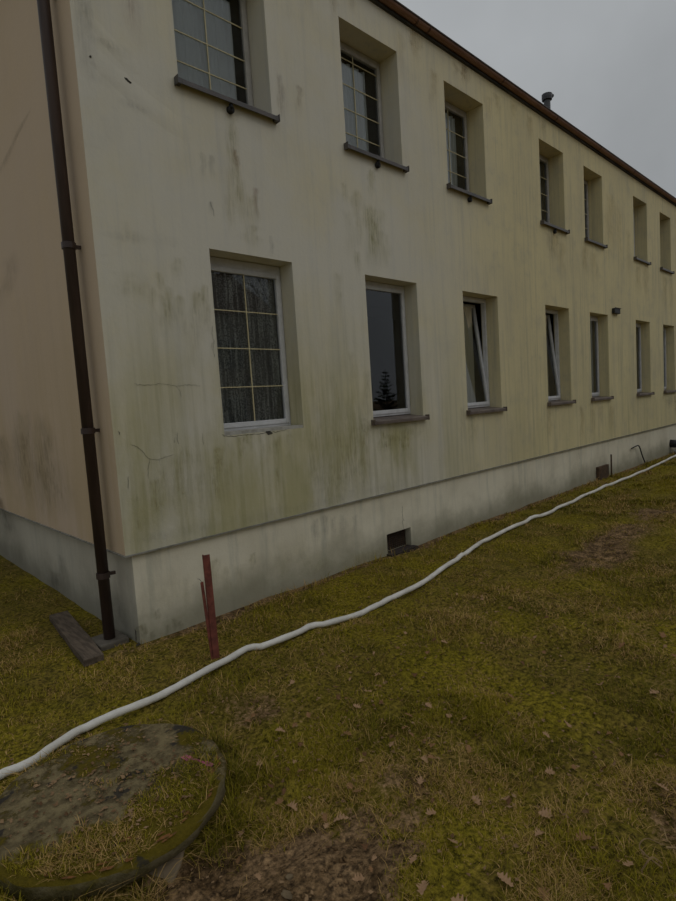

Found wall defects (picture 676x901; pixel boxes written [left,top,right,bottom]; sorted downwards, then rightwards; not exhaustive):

crack [203,429,287,444]